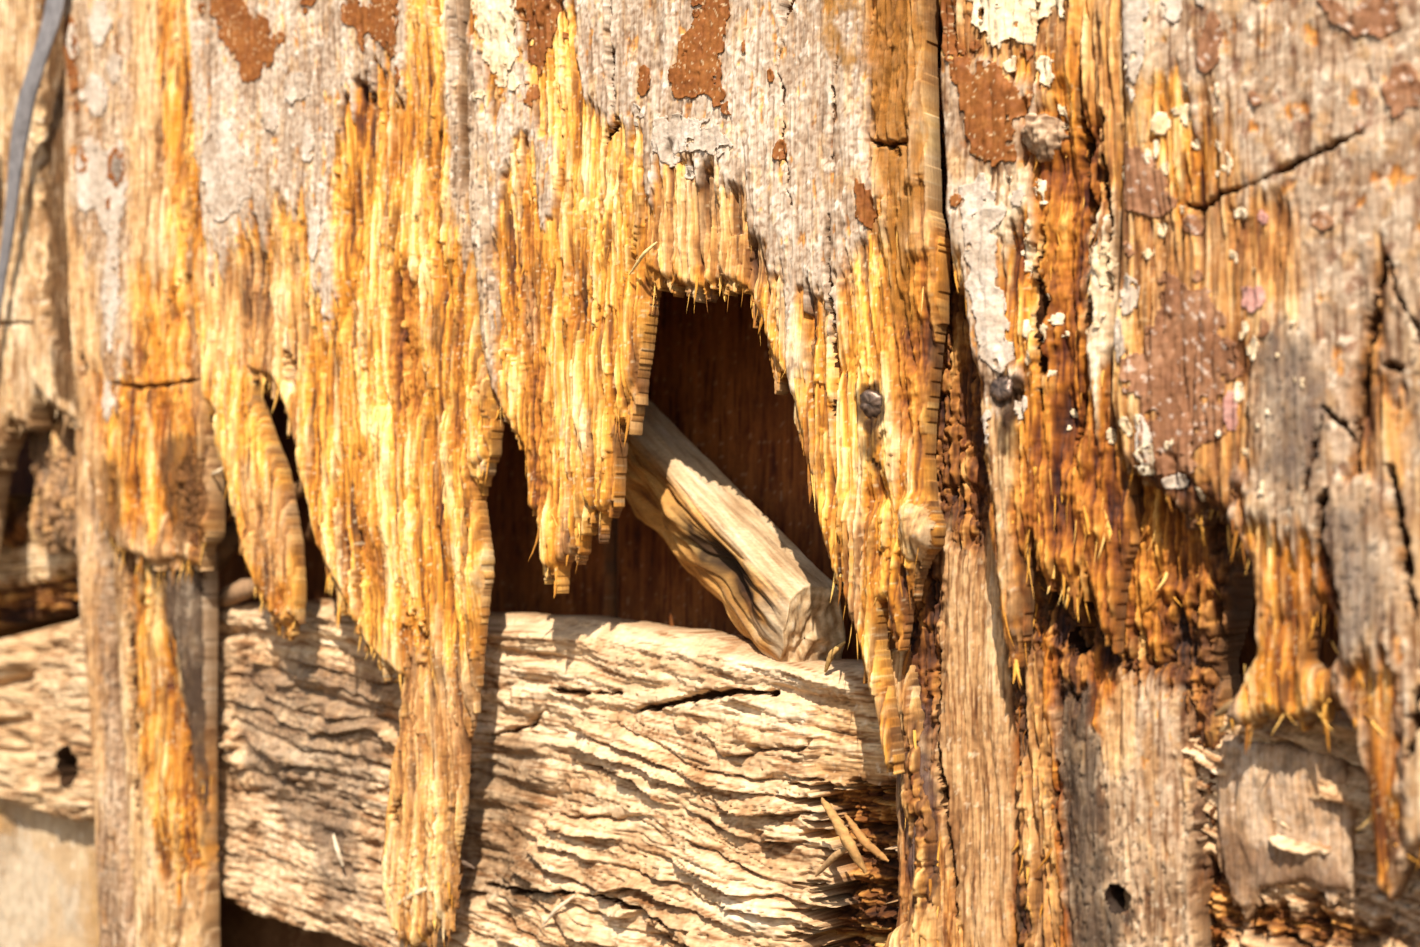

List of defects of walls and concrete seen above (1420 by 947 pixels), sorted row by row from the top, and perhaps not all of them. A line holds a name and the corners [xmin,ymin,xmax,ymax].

peeling [197,0,286,83]
peeling [340,0,401,87]
peeling [470,0,569,108]
peeling [632,0,745,180]
peeling [1316,0,1403,39]
peeling [1381,62,1420,118]
peeling [854,178,878,229]
crack [1188,139,1350,215]
peeling [941,0,1270,502]
crack [81,352,199,391]
crack [1304,255,1420,614]
crack [499,687,781,734]